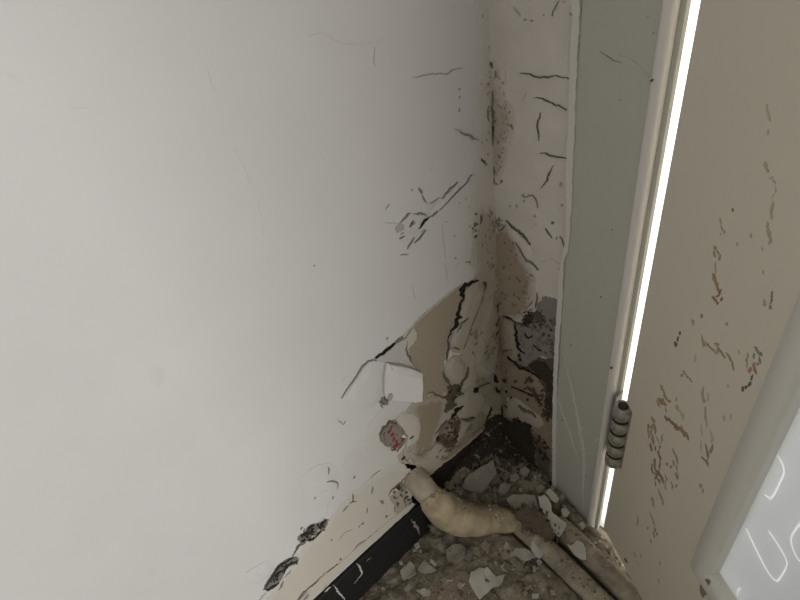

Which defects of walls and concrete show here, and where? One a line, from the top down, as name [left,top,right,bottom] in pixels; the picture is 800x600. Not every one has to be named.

crack [418,68,461,77]
crack [520,73,569,208]
leakage [316,0,556,524]
crack [499,220,539,271]
crack [327,174,490,514]
peeling [375,283,463,403]
flaking render [516,295,557,366]
leakage [282,541,309,578]
peeling [263,412,421,600]